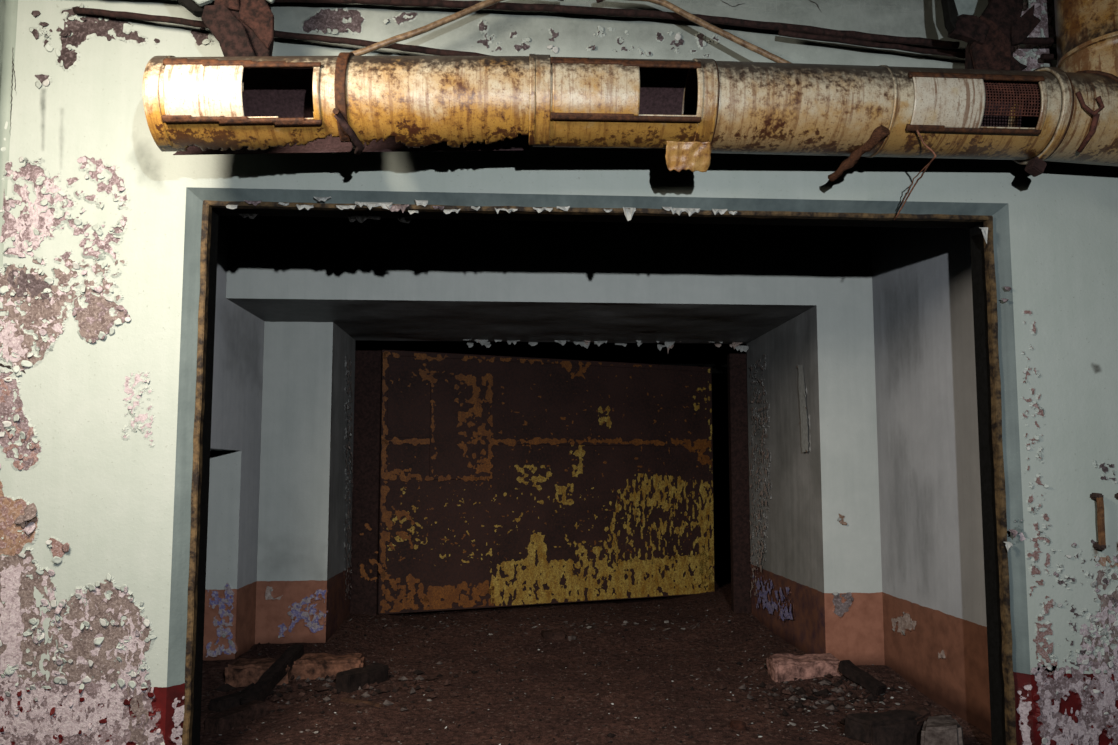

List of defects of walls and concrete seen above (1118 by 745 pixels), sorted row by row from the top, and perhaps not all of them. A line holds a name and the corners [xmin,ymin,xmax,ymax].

peeling [301,7,366,35]
peeling [383,11,417,26]
flaking render [29,3,160,89]
flaking render [189,28,214,48]
peeling [278,196,480,223]
peeling [603,207,636,221]
peeling [663,207,737,217]
peeling [463,339,538,348]
peeling [555,340,642,349]
peeling [0,156,185,745]
peeling [1004,309,1118,745]
peeling [205,583,238,659]